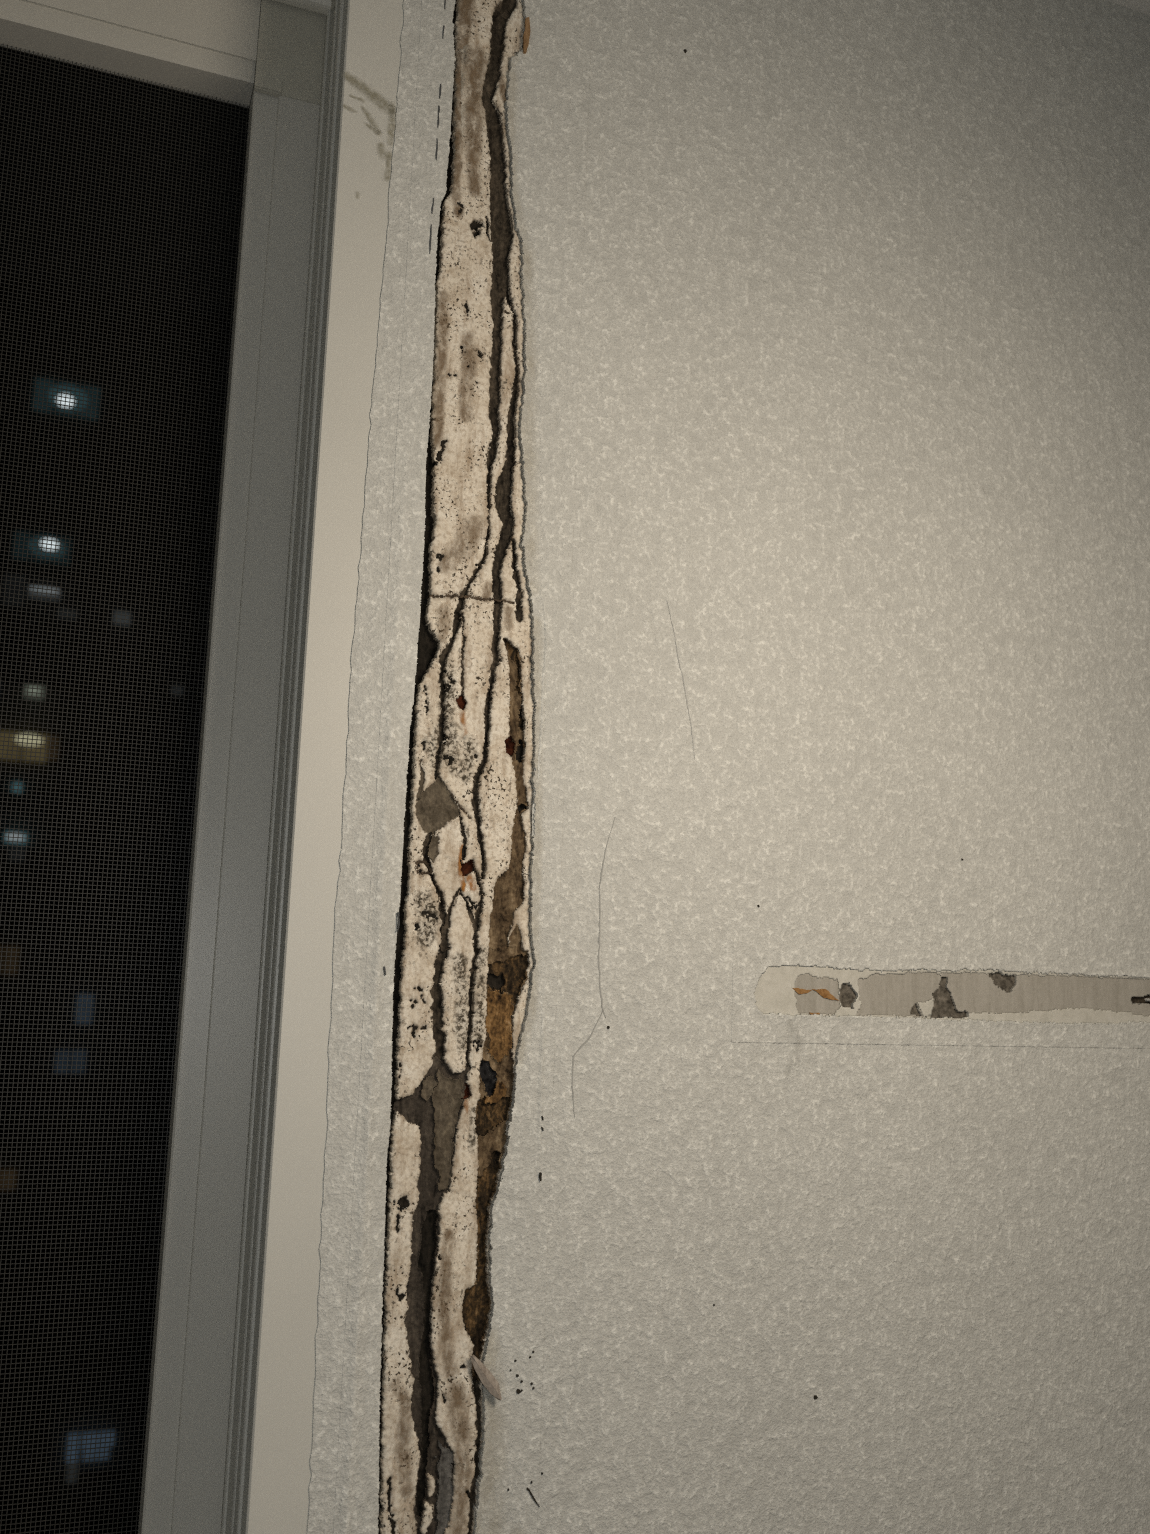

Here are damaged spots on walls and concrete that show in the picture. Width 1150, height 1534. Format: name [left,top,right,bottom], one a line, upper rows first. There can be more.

damp [453,0,484,216]
damp [434,298,447,445]
damp [426,659,474,780]
peeling [378,0,535,1534]
damp [416,893,438,945]
damp [454,948,485,1052]
spalling [840,983,856,1009]
spalling [910,977,966,1018]
spalling [989,972,1015,993]
damp [399,1392,409,1462]
damp [440,1259,469,1534]